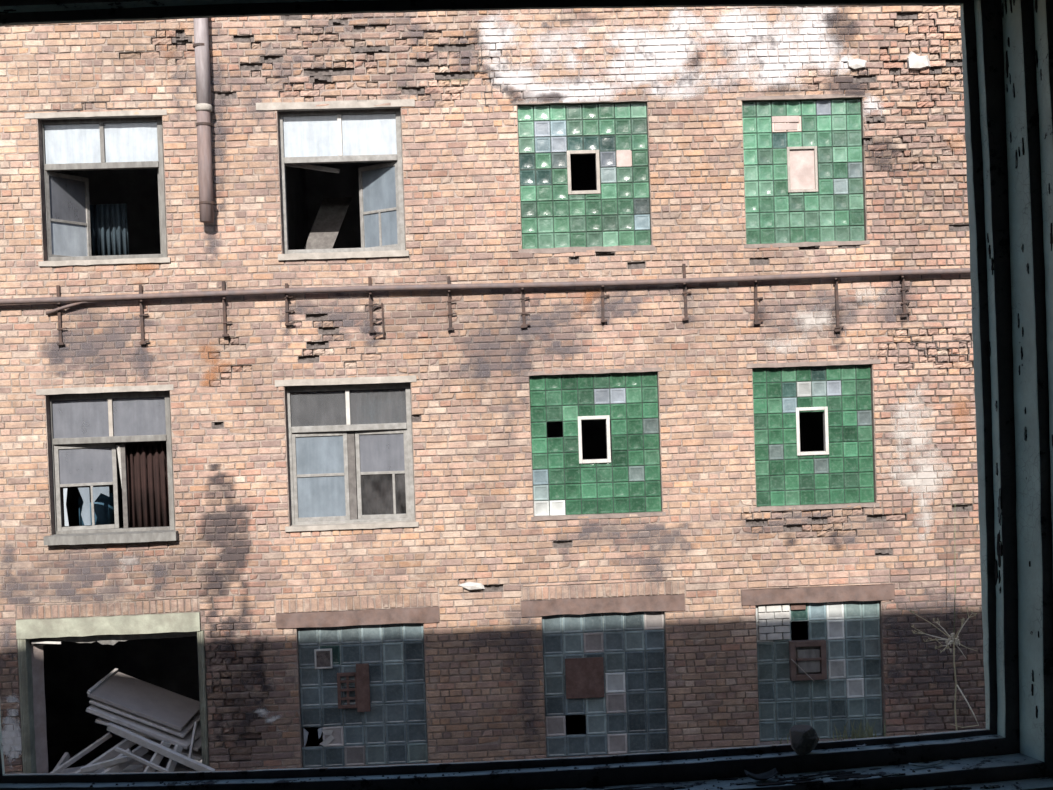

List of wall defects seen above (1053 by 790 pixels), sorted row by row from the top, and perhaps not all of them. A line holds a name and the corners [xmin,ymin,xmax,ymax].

spalling [233,14,502,108]
water stain [568,38,591,82]
spalling [795,6,963,172]
spalling [949,224,969,232]
spalling [293,313,381,369]
spalling [365,305,386,340]
spalling [741,507,905,538]
spalling [875,548,892,556]
water stain [208,582,249,661]